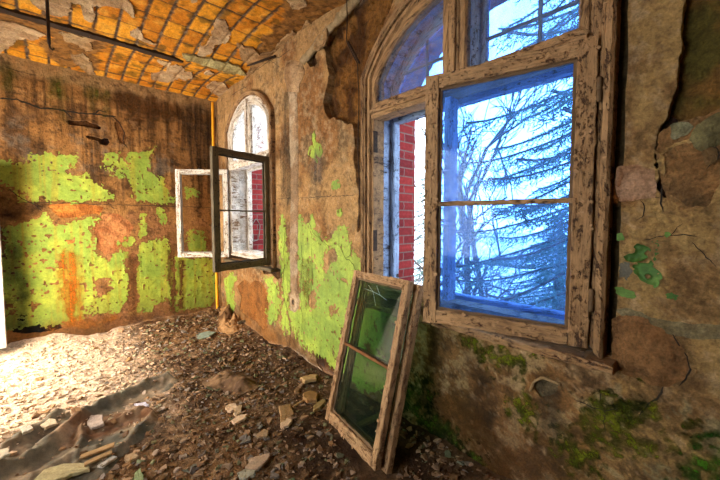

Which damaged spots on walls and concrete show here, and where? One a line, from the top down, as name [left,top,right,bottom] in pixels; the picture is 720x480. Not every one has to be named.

crack [0,97,127,147]
water stain [85,88,210,169]
spalling [651,0,720,207]
peeling [0,0,408,394]
peeling [614,232,671,299]